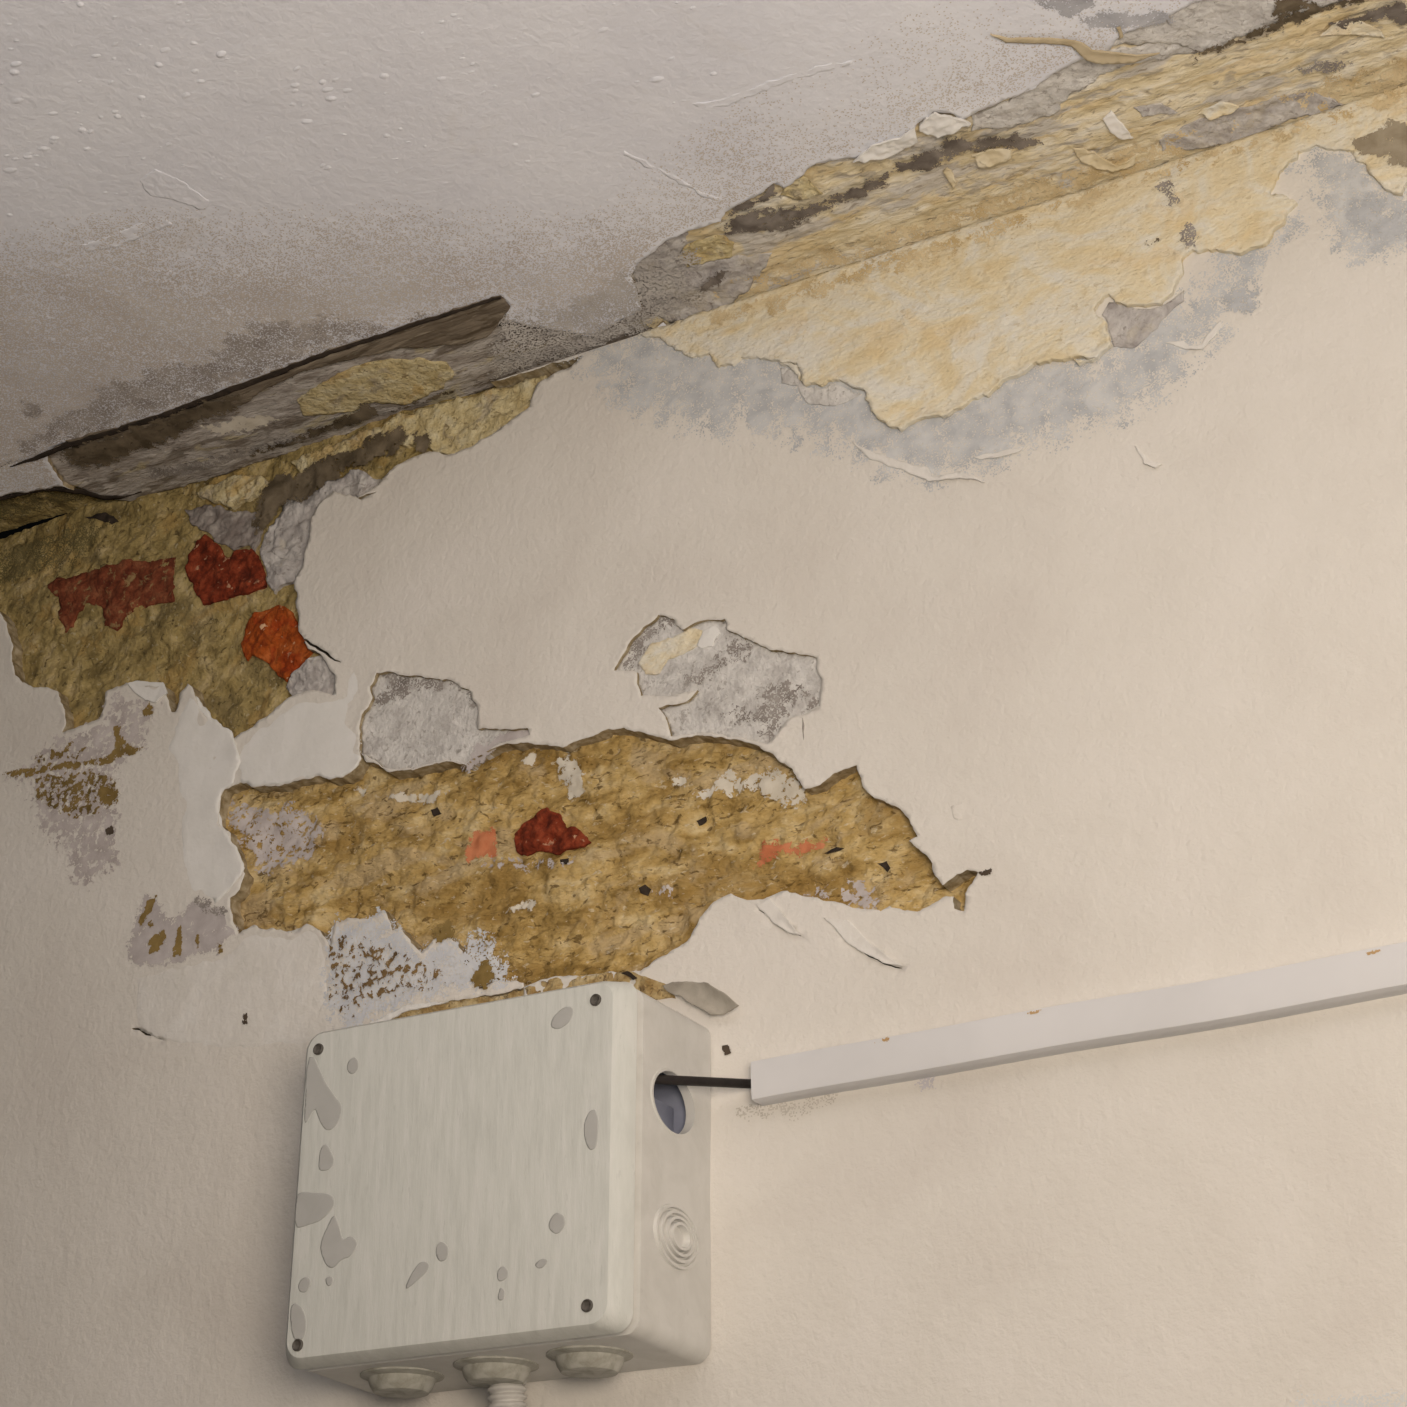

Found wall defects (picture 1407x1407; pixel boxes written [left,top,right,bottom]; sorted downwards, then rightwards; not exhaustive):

water stain [0,0,1188,494]
peeling [990,26,1160,65]
peeling [1320,21,1385,39]
peeling [0,85,1407,1049]